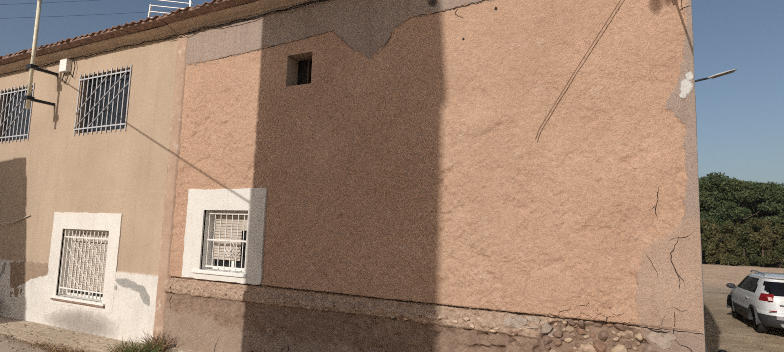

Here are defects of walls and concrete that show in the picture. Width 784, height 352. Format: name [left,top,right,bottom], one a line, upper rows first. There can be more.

peeling [0,262,48,297]
spalling [180,285,676,352]
crack [169,236,702,352]